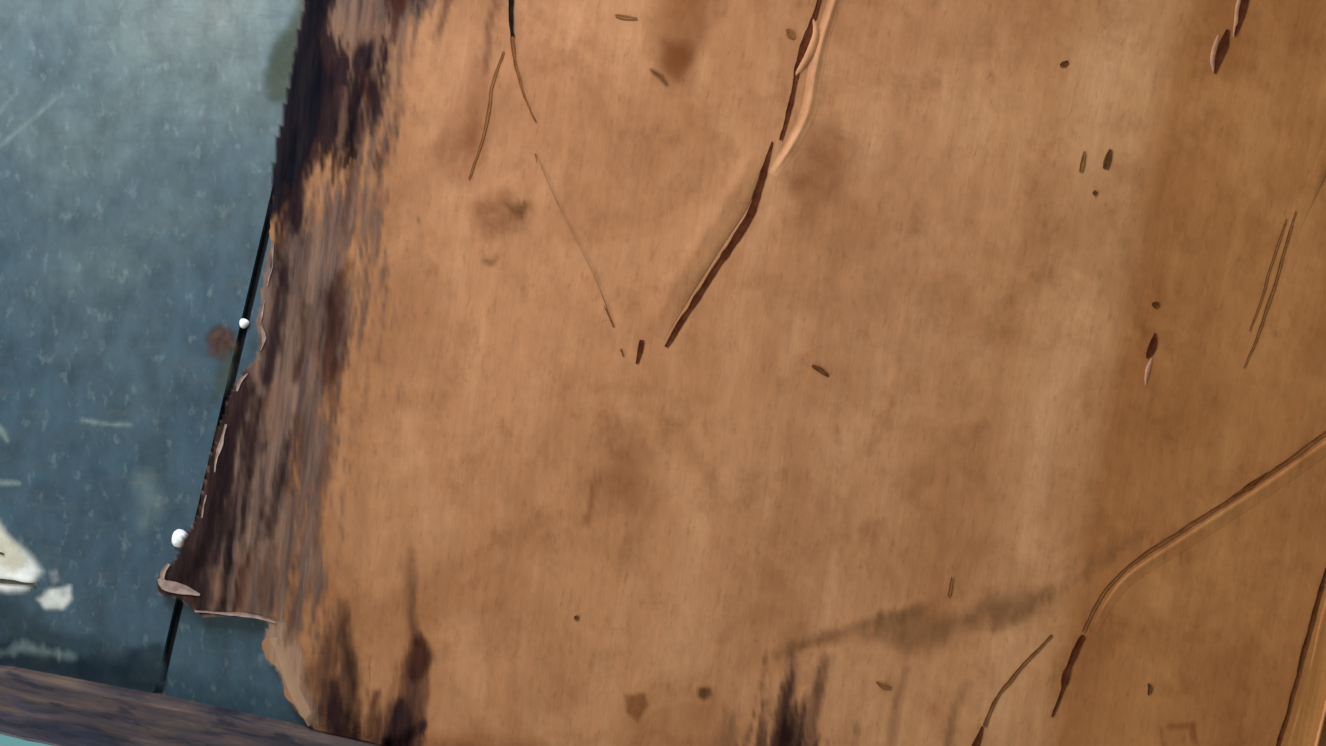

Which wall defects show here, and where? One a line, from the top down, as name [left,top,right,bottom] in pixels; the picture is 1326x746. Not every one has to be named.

crack [469,0,842,364]
peeling [214,424,227,472]
rust [209,326,235,358]
damp [158,0,430,746]
crack [1244,211,1297,368]
crack [972,431,1326,746]
peeling [266,632,318,726]
damp [757,645,823,746]